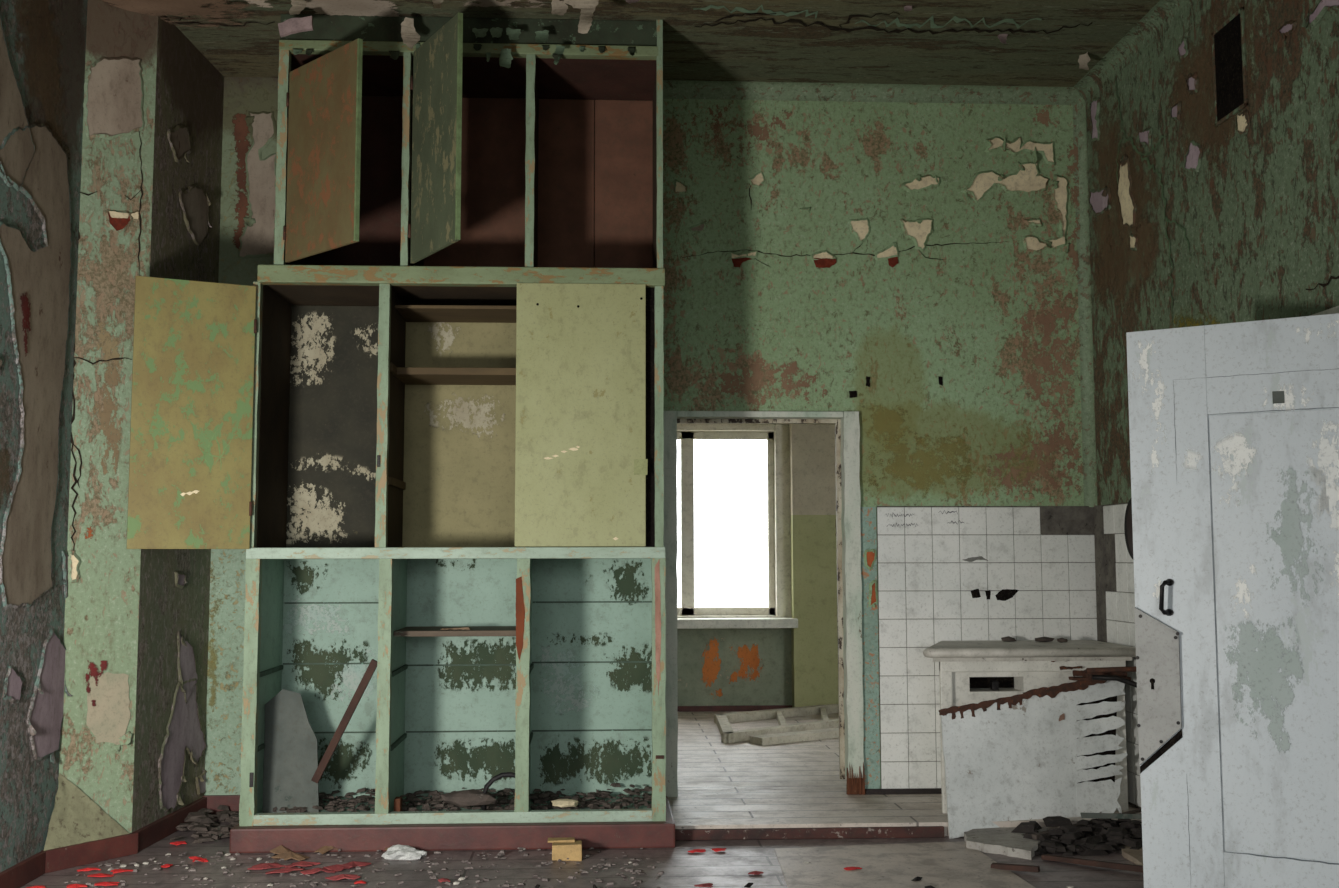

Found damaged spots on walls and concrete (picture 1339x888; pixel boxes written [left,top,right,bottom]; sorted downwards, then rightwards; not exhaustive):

flaking render [83,56,145,140]
flaking render [289,0,420,60]
crack [693,5,1092,35]
leakage [1166,0,1271,174]
flaking render [0,11,82,609]
flaking render [238,111,277,259]
crack [682,241,1007,267]
peeling [961,97,1152,501]
leakage [1088,82,1167,319]
leakage [1174,310,1220,328]
leakage [859,393,972,496]
flaking render [2,629,132,764]